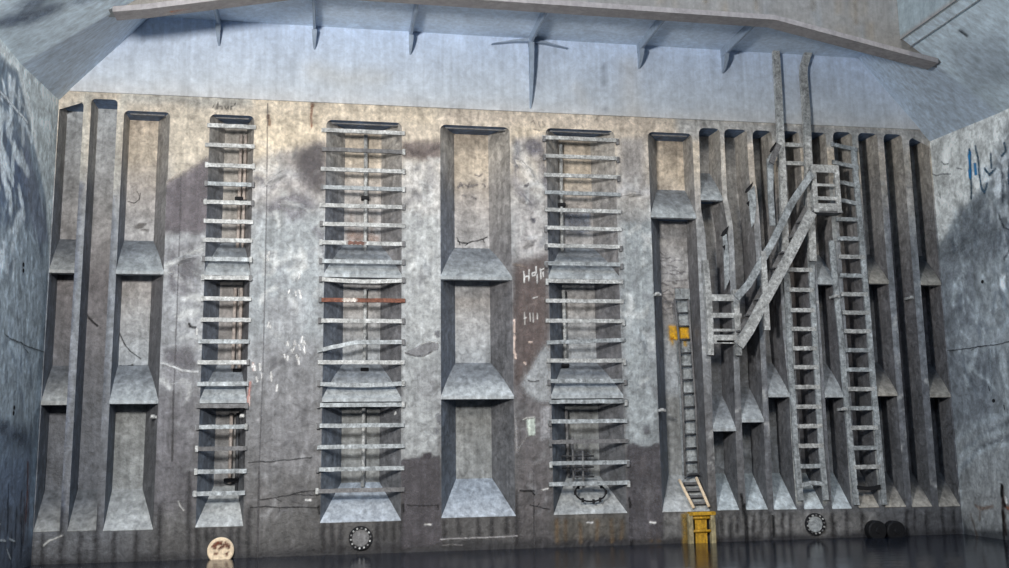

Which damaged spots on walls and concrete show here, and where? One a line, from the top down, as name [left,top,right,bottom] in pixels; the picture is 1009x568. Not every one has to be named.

leakage [570,451,590,476]